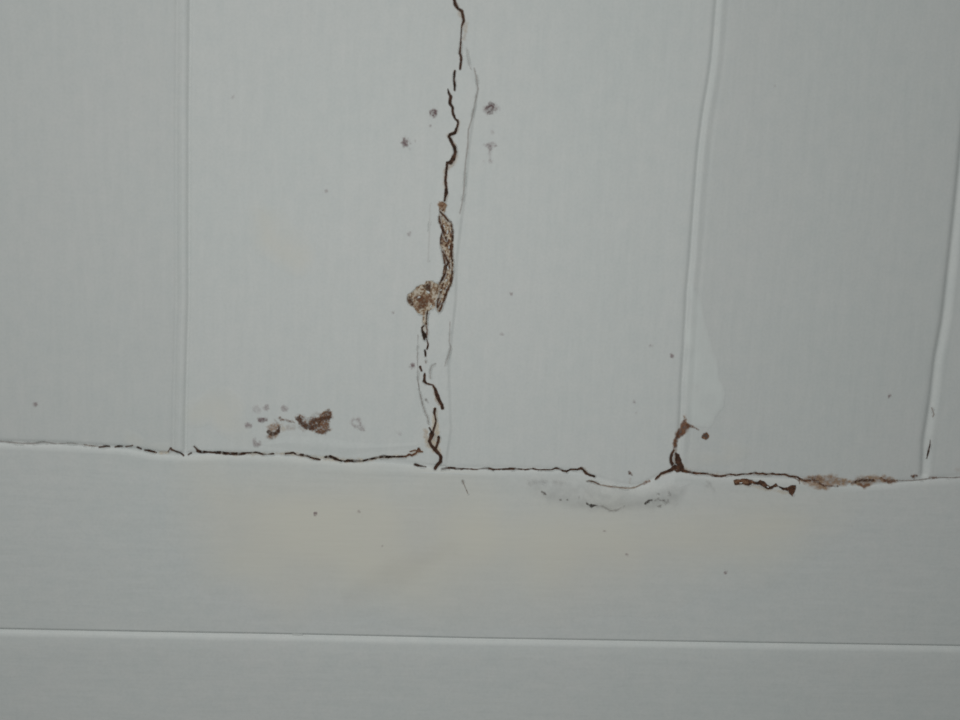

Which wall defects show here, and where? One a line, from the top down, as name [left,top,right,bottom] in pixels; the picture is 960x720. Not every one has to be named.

crack [444,0,465,201]
rust [296,411,331,434]
crack [99,310,641,488]
rust [645,420,709,483]
crack [687,471,811,481]
rust [801,475,897,489]